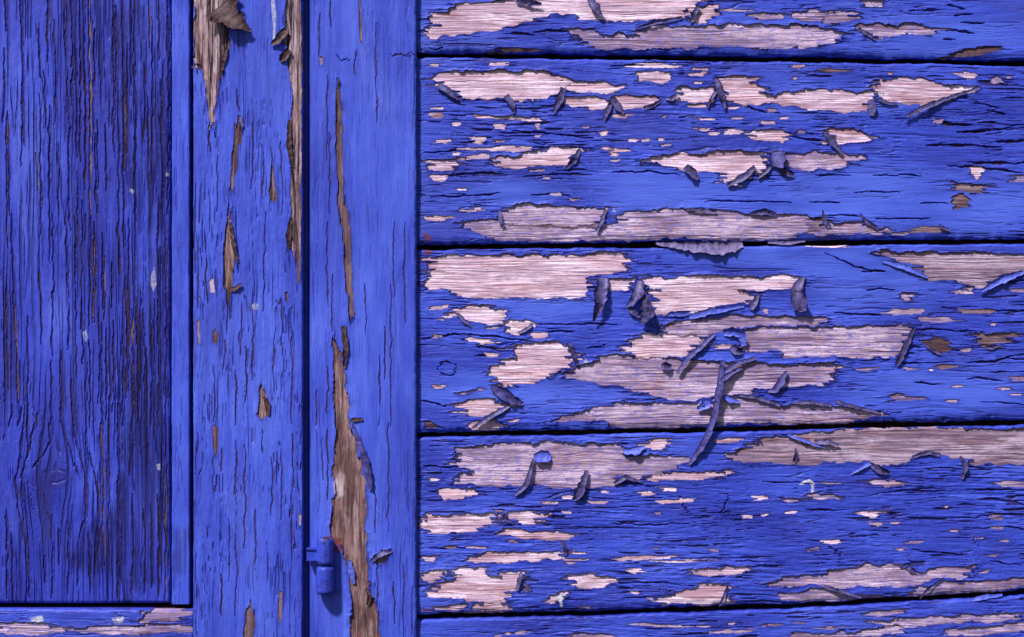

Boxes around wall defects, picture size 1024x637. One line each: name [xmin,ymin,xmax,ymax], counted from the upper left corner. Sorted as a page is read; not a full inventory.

peeling [191,0,251,134]
peeling [271,0,303,284]
peeling [423,0,953,51]
peeling [422,46,1012,187]
peeling [950,166,995,210]
peeling [330,78,392,637]
peeling [417,192,1024,613]
peeling [0,608,193,636]
peeling [628,554,1024,637]